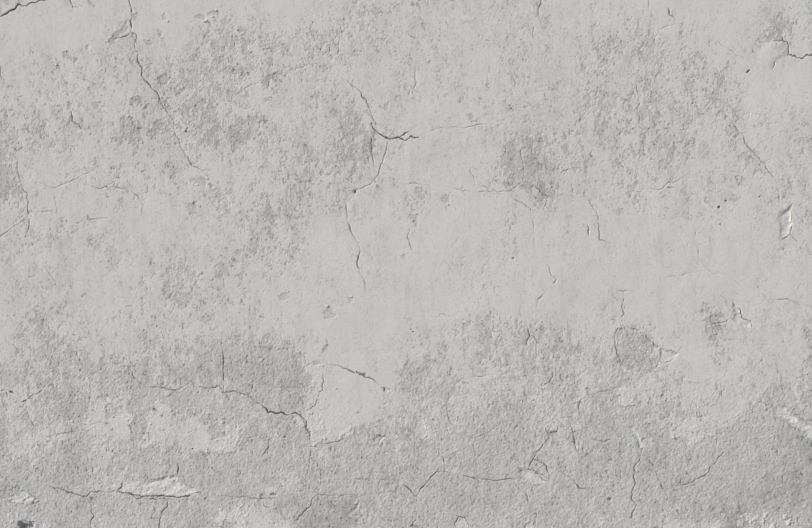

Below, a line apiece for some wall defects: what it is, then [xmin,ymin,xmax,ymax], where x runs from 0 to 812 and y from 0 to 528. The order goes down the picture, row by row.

crack [0,0,49,17]
crack [115,0,212,172]
crack [764,36,812,70]
crack [0,137,149,253]
crack [344,80,488,292]
crack [452,147,613,381]
crack [731,120,799,243]
spalling [776,203,794,241]
crack [0,380,200,528]
spalling [118,474,197,498]
crack [125,289,730,528]
spalling [772,405,812,441]